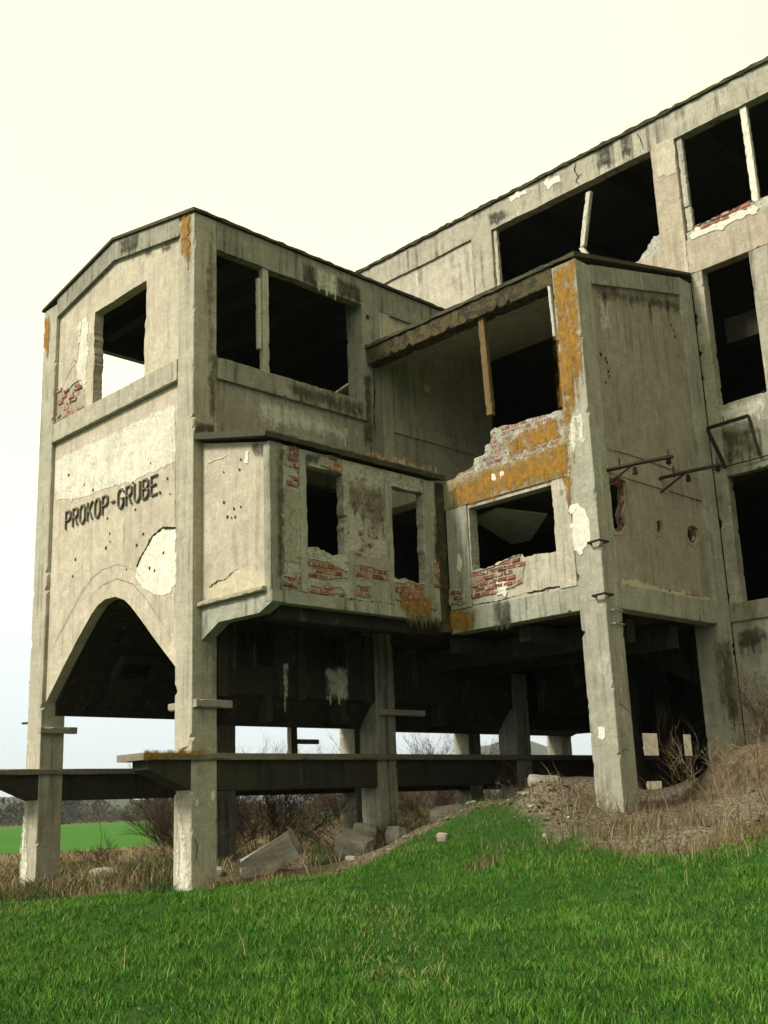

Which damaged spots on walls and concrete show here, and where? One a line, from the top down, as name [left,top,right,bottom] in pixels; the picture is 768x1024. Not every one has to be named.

corrosion [180,214,190,270]
spalling [690,200,759,240]
flaking render [55,316,89,422]
corrosion [452,260,582,514]
spalling [126,526,176,596]
flaking render [281,445,526,606]
flaking render [569,503,591,555]
damp [326,669,347,705]